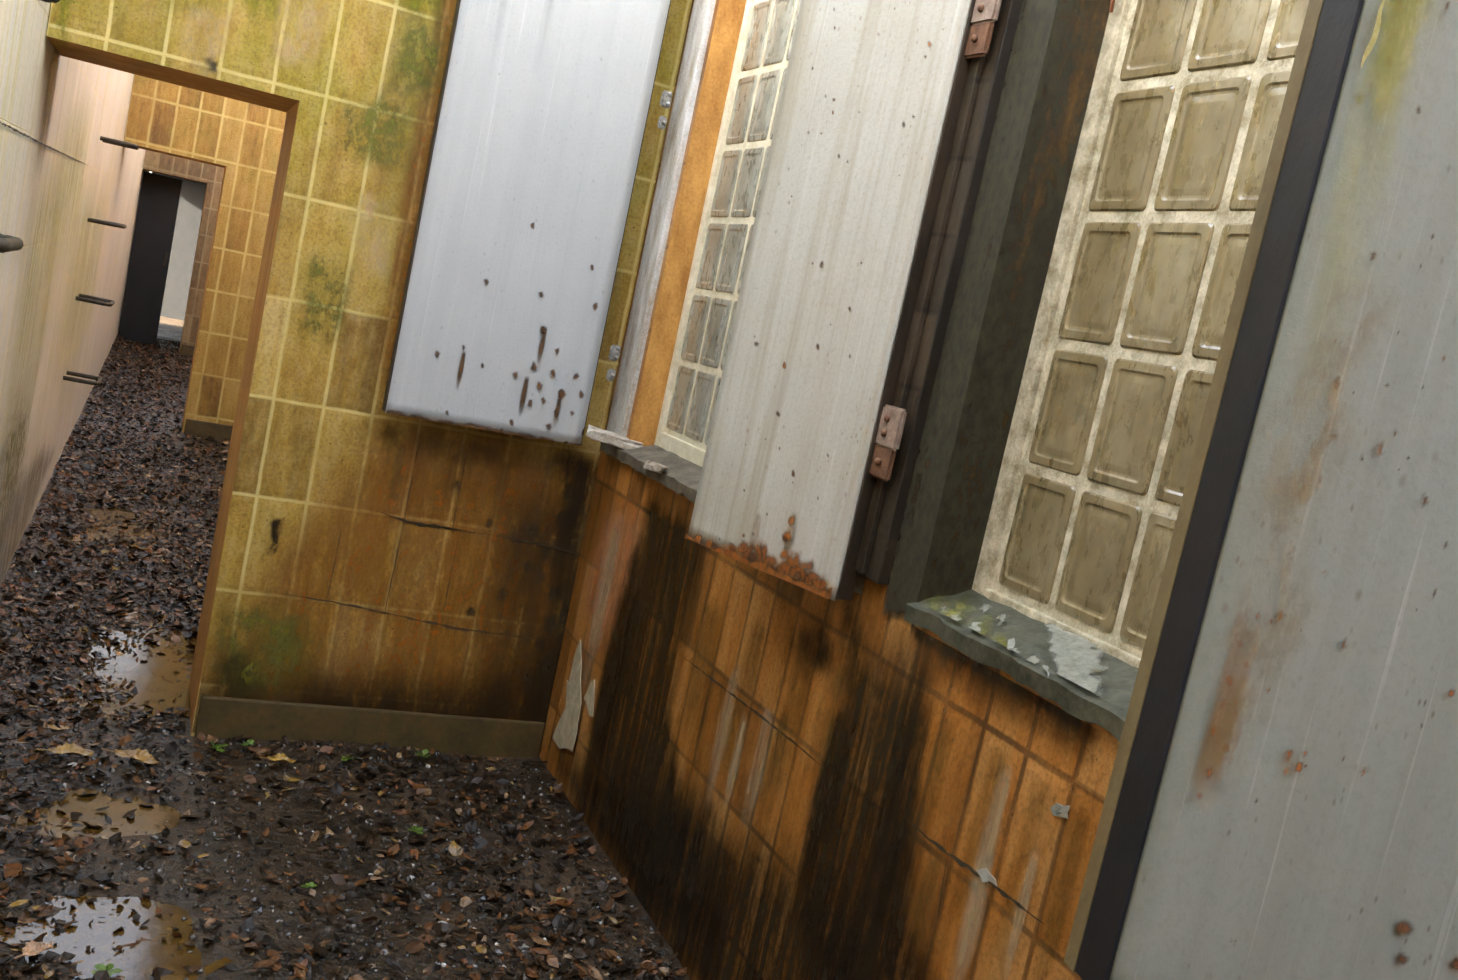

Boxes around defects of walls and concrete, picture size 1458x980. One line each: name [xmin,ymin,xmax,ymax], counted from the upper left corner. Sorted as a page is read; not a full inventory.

crack [0,122,87,165]
rust [386,326,585,446]
water stain [224,0,1111,980]
rust [684,516,832,600]
flaking render [552,639,595,752]
rust [1396,921,1413,934]